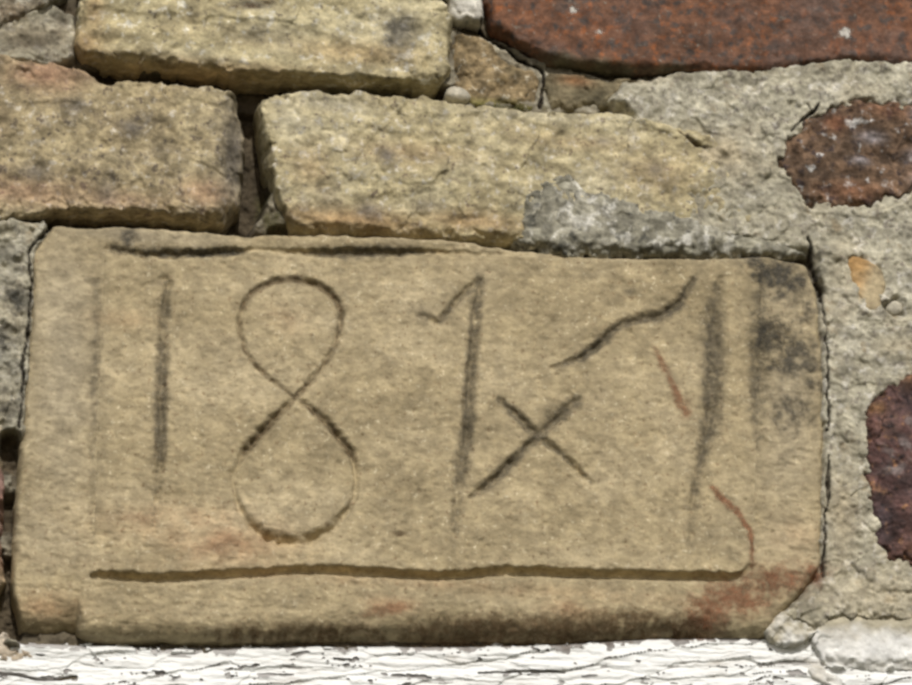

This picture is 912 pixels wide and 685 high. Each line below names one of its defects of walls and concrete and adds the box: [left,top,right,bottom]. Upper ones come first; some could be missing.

crack [806,238,830,431]
crack [820,455,831,578]
peeling [0,611,912,685]